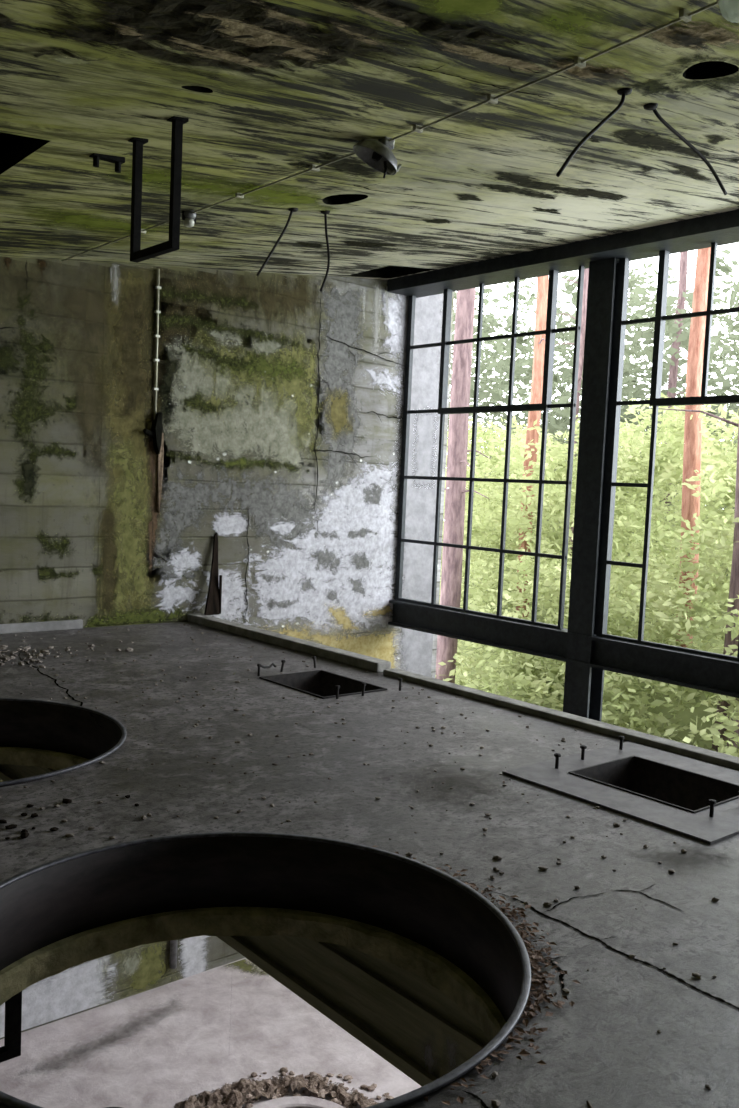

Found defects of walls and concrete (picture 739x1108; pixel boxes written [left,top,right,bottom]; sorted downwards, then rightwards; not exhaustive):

leakage [631,55,739,96]
leakage [283,150,383,181]
leakage [589,130,732,181]
leakage [455,172,627,214]
leakage [0,257,388,626]
peeling [156,292,451,677]
crack [491,884,739,1009]